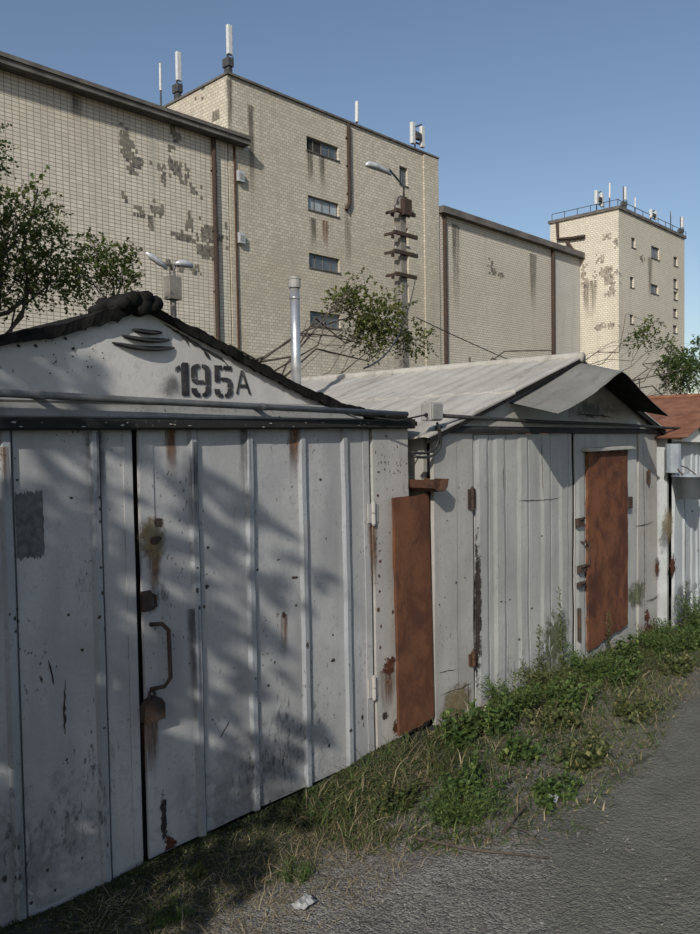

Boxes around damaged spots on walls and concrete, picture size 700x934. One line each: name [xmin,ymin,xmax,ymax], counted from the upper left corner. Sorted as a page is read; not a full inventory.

spalling [119,122,203,199]
spalling [121,191,164,231]
spalling [163,210,228,276]
spalling [581,254,622,298]
rust [139,518,164,581]
rust [473,534,482,686]
rust [160,799,177,851]